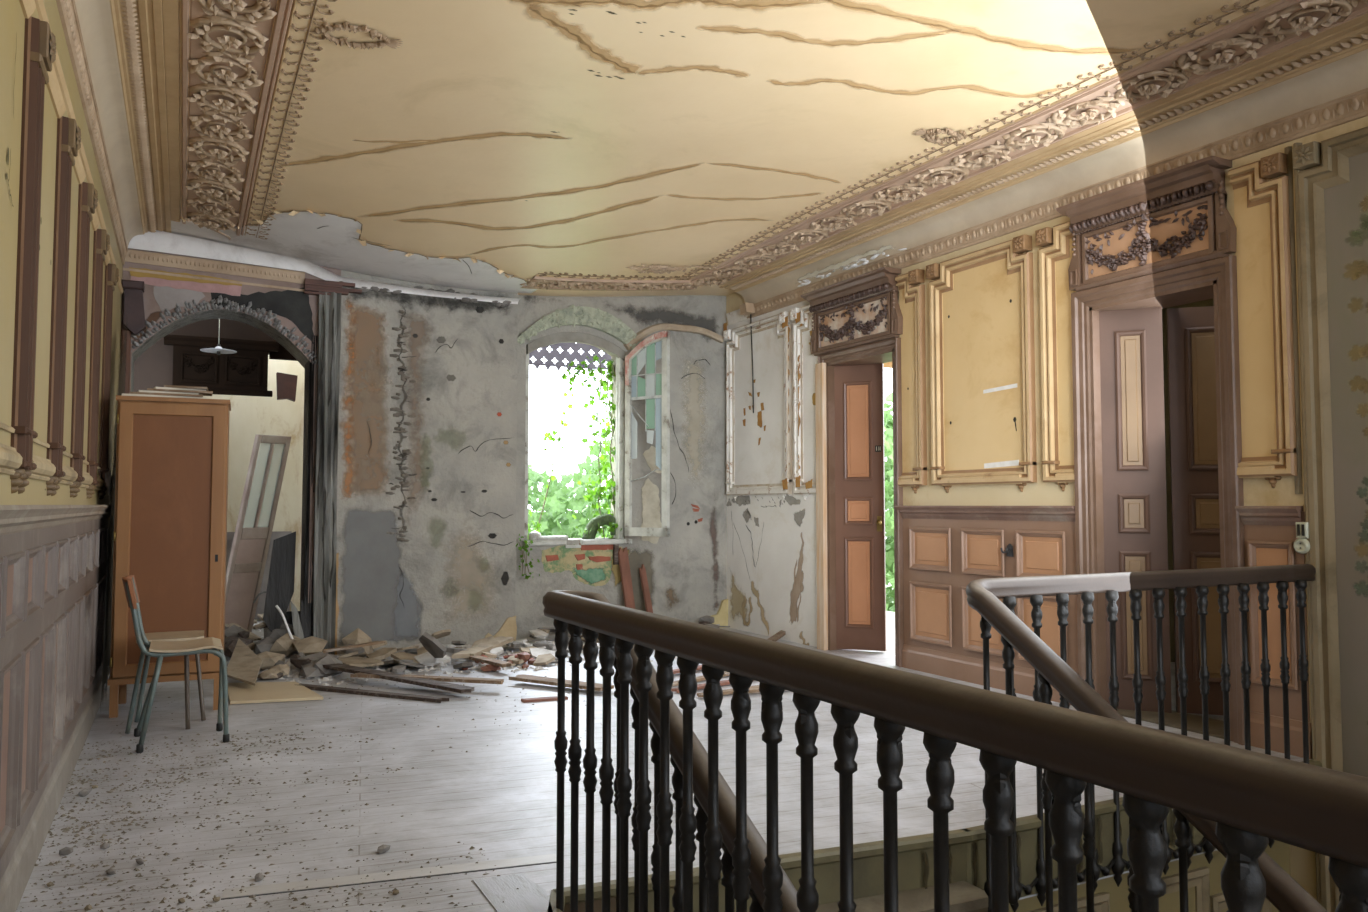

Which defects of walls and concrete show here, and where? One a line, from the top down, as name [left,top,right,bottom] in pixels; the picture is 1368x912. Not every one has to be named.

flaking render [171,210,539,542]
peeling [743,379,766,445]
peeling [782,310,833,490]